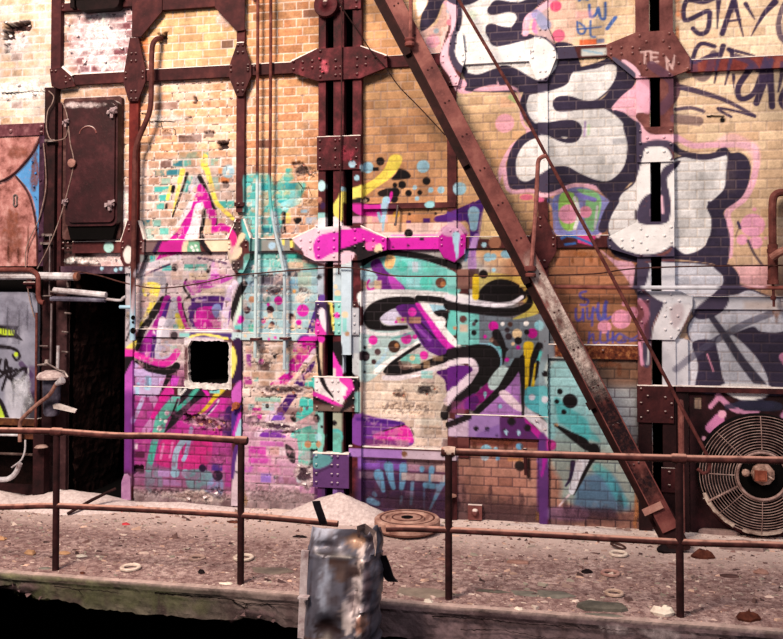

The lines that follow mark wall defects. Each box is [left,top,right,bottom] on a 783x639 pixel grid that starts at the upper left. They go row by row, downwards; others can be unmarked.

corrosion [472,438,523,448]